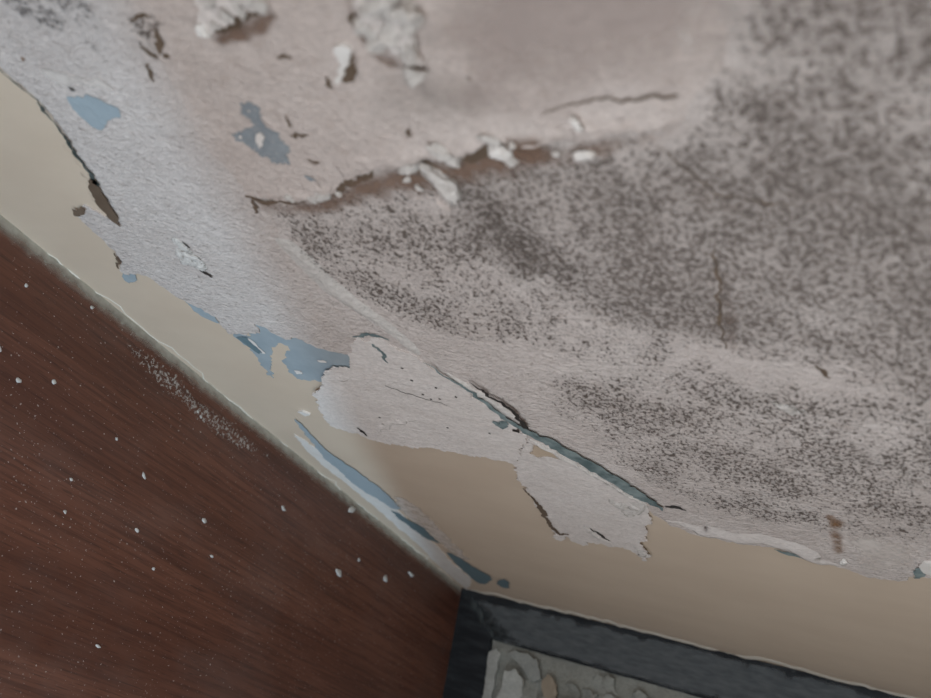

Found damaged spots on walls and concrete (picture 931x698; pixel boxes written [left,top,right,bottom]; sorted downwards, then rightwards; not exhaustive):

flaking render [125,13,170,82]
peeling [194,0,273,43]
peeling [325,42,358,89]
flaking render [347,0,429,88]
flaking render [245,94,677,214]
flaking render [171,237,212,278]
leakage [275,0,931,543]
peeling [312,333,528,464]
flaking render [814,360,873,380]
peeling [511,440,653,561]
peeling [667,521,849,566]
peeling [913,561,931,579]